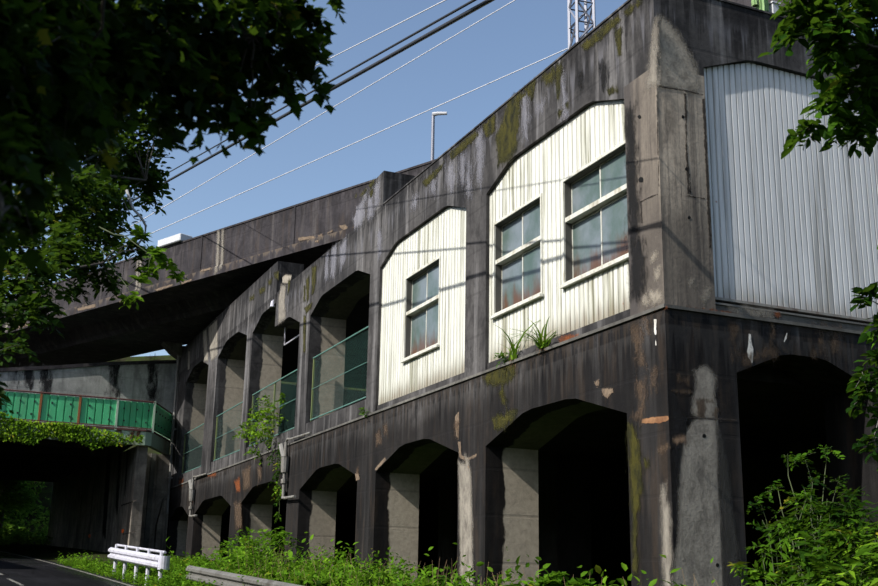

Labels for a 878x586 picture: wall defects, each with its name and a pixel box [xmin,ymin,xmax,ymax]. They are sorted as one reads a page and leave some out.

water stain [624,106,647,302]
crack [640,85,712,248]
water stain [105,360,120,400]
water stain [146,357,159,404]
spalling [642,416,669,424]
water stain [658,395,687,487]
water stain [458,454,474,586]